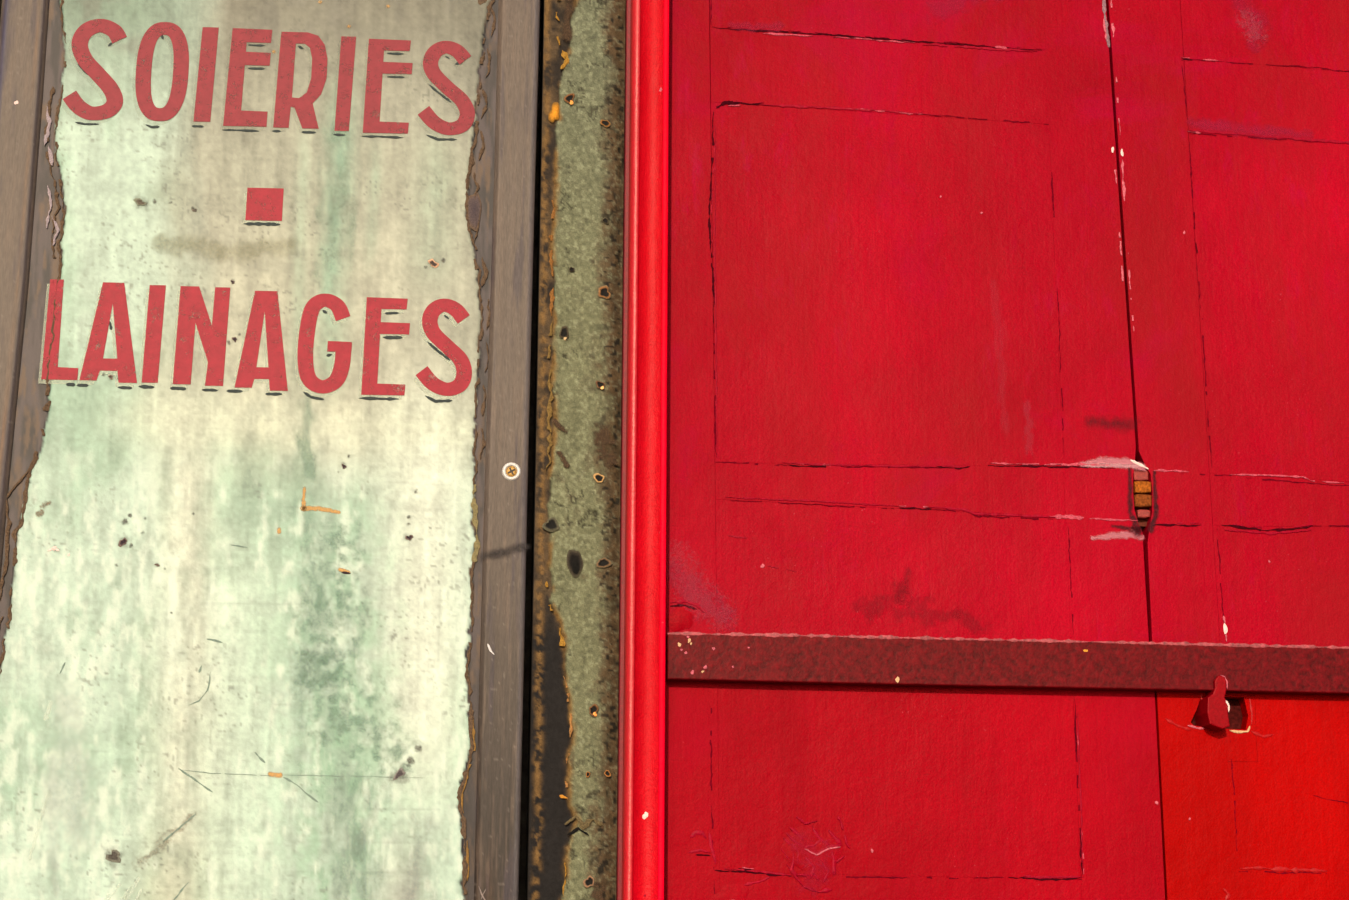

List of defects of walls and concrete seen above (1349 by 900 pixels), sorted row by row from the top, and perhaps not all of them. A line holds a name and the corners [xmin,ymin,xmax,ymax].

peeling [42,85,66,411]
rust [548,102,560,123]
rust [555,0,574,69]
crack [708,100,1110,469]
crack [1154,57,1349,486]
peeling [0,451,38,674]
peeling [456,0,496,900]
crack [725,497,1349,637]